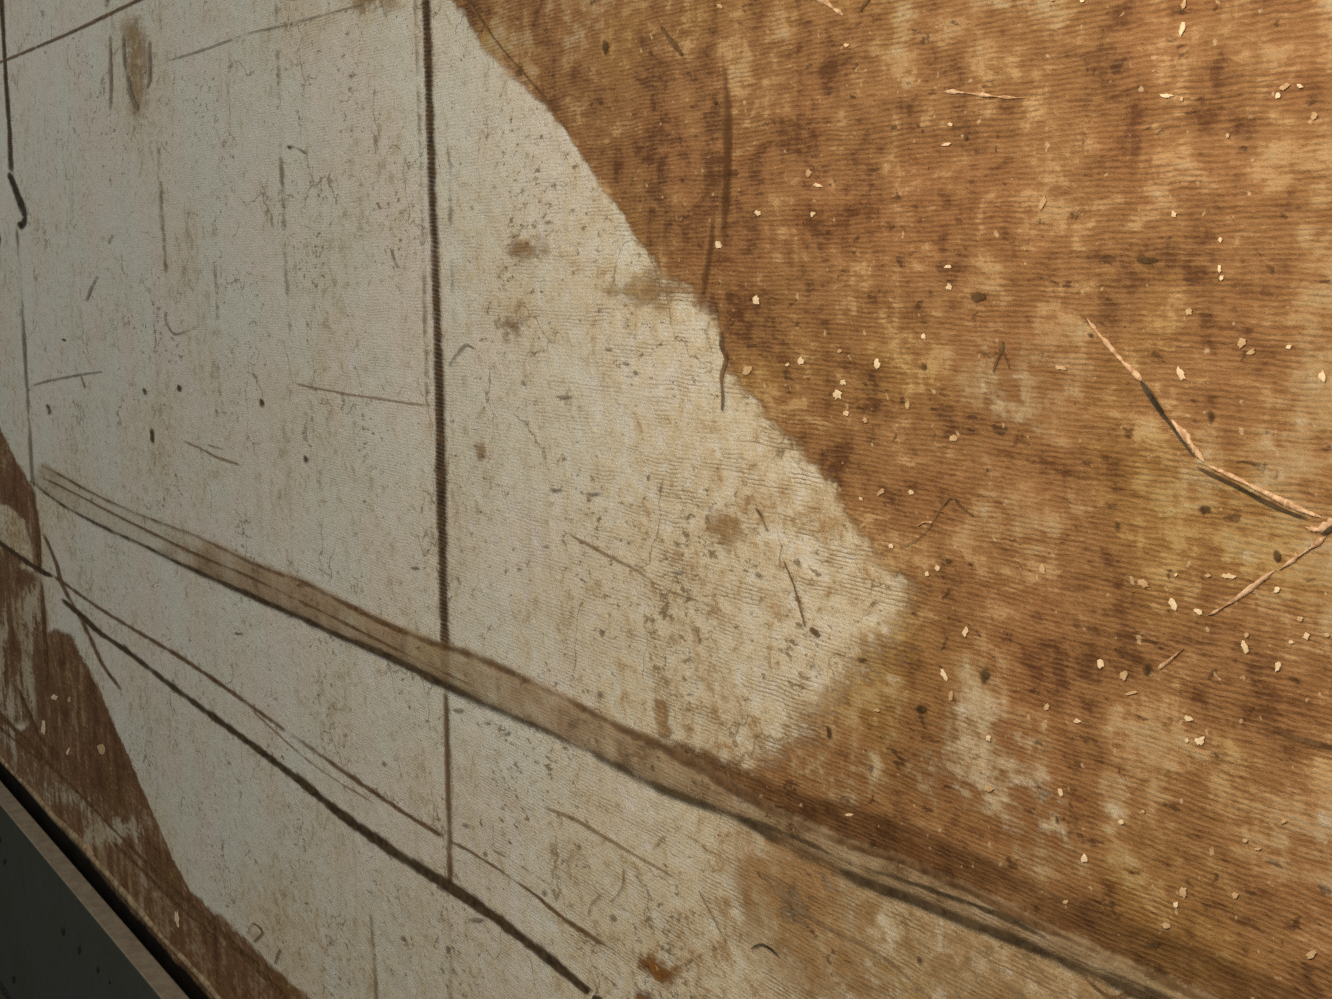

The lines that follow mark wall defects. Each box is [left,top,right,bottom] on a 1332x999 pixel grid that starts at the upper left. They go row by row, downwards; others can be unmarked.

leakage [0,432,309,999]
leakage [452,0,1332,999]
peeling [1120,663,1152,695]
crack [1158,649,1183,669]
crack [1087,318,1332,616]
peeling [1289,616,1330,644]